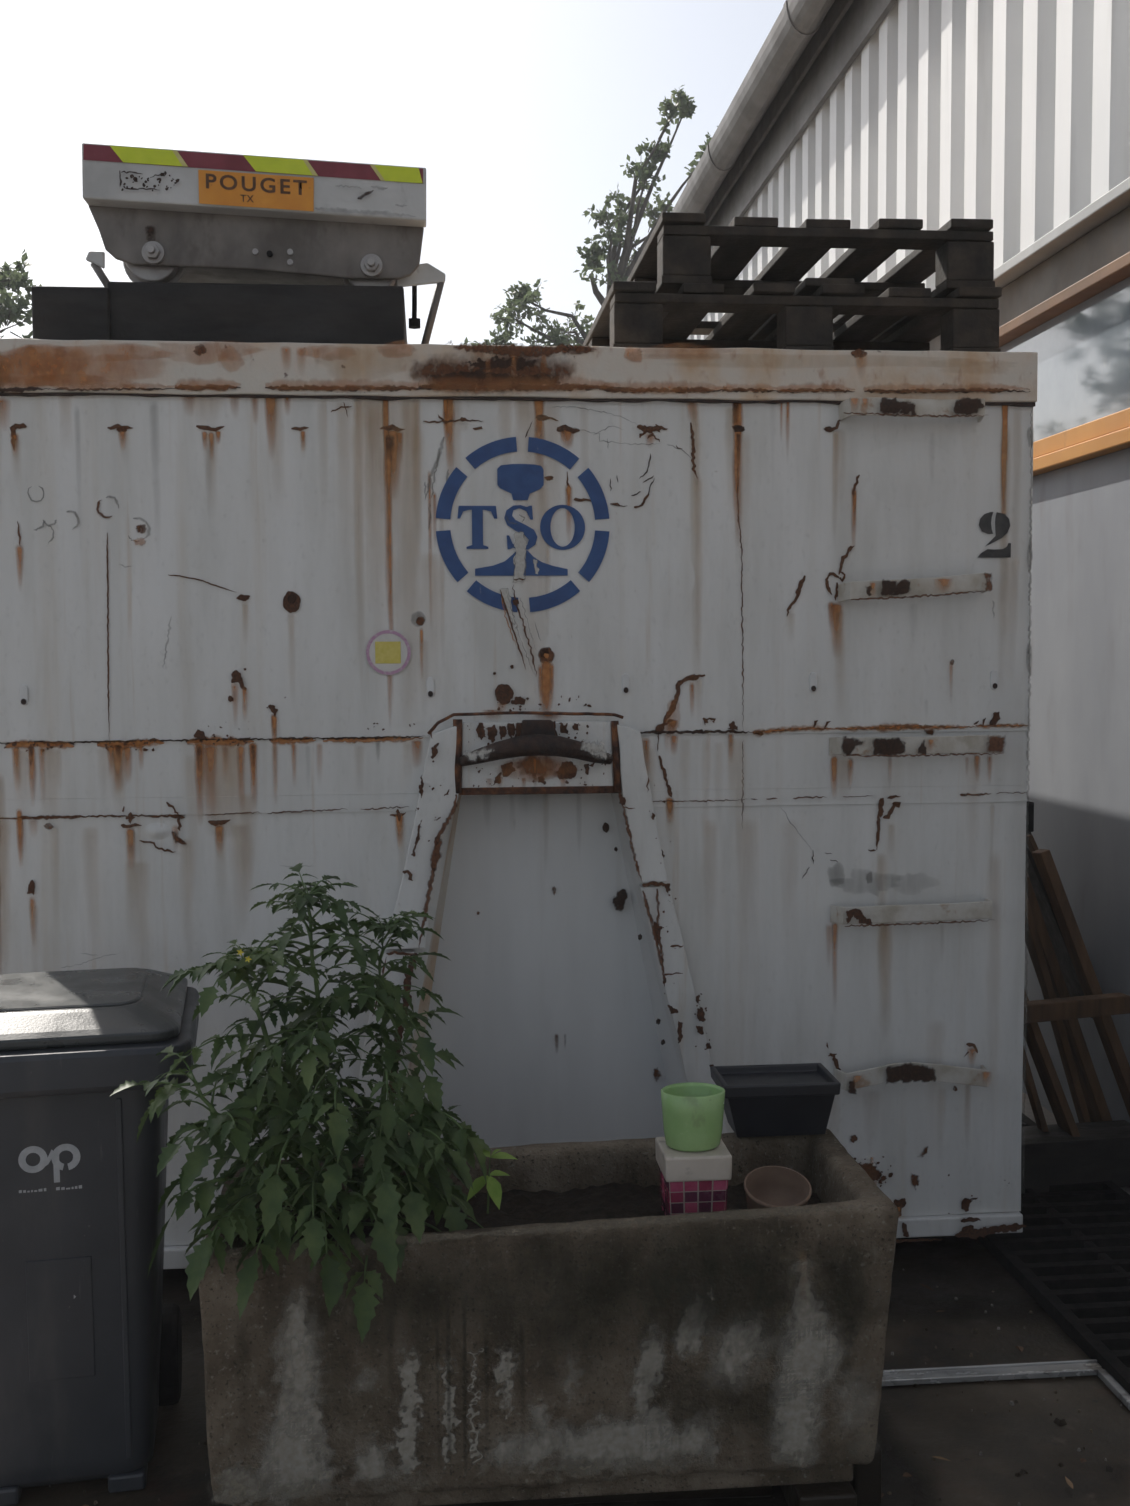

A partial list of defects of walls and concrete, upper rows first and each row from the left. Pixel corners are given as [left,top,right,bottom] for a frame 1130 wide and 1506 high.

corrosion [0,341,1035,829]
corrosion [0,811,184,843]
corrosion [27,880,35,921]
corrosion [619,793,684,976]
corrosion [381,794,457,1105]
corrosion [833,919,991,957]
corrosion [826,1043,861,1083]
corrosion [896,1217,1026,1243]